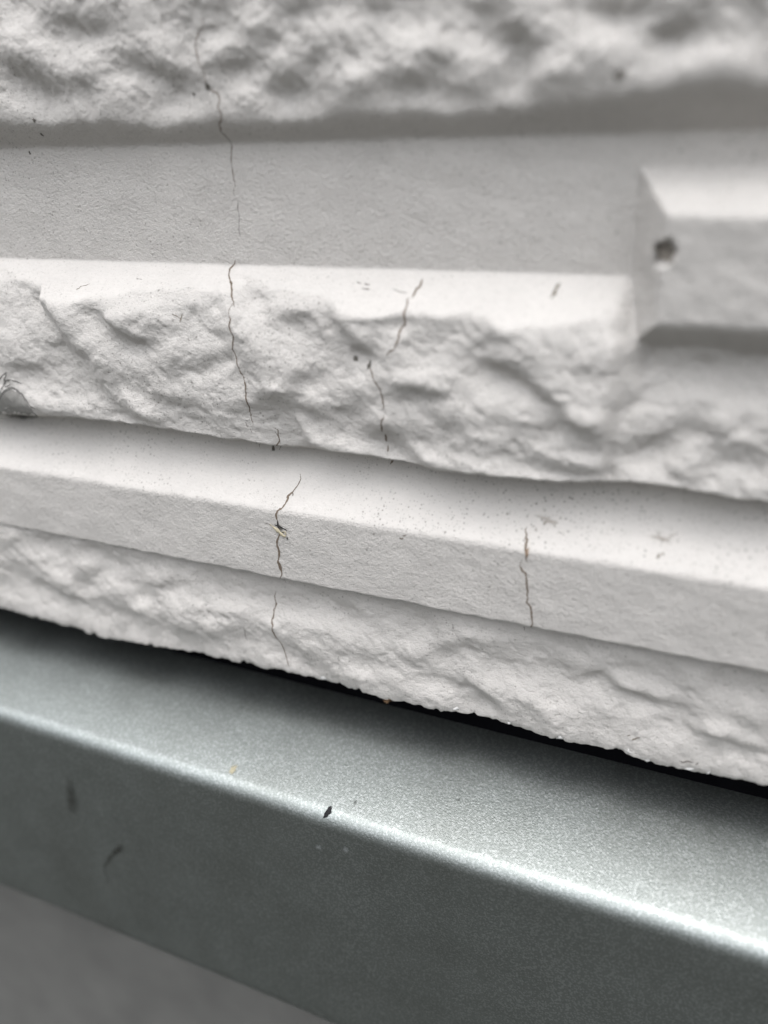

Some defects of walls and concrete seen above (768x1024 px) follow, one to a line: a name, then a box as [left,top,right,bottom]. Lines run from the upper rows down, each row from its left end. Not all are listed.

crack [188,18,240,233]
crack [228,262,281,450]
crack [369,279,423,464]
crack [265,476,301,674]
crack [520,527,533,630]